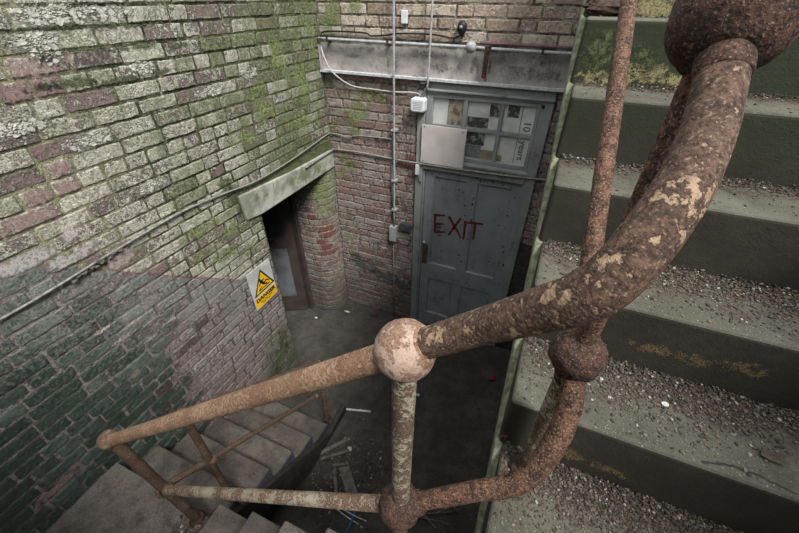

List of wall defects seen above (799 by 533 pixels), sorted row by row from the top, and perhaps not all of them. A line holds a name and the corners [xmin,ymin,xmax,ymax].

leakage [181,175,252,267]